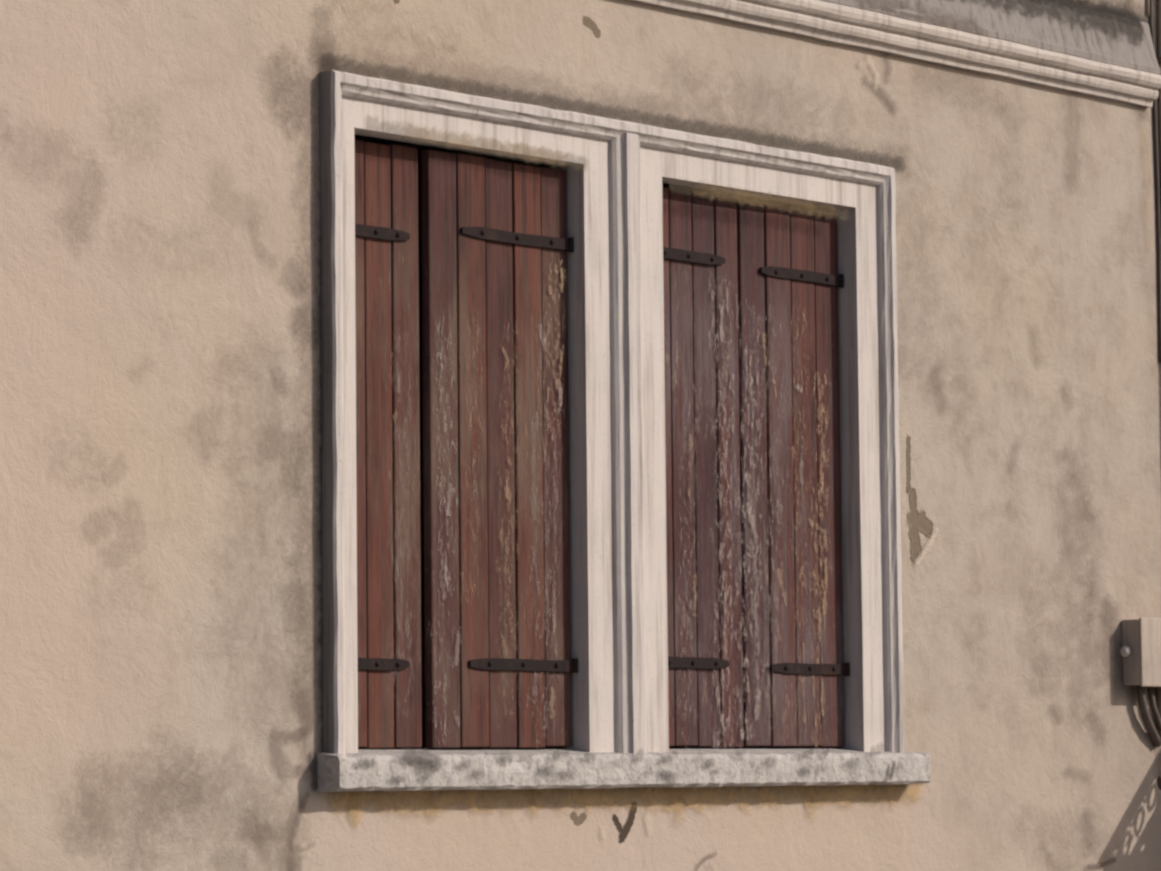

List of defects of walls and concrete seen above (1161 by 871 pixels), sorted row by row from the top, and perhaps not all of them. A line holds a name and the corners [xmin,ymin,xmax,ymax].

damp [1036,0,1140,26]
spalling [906,434,934,563]